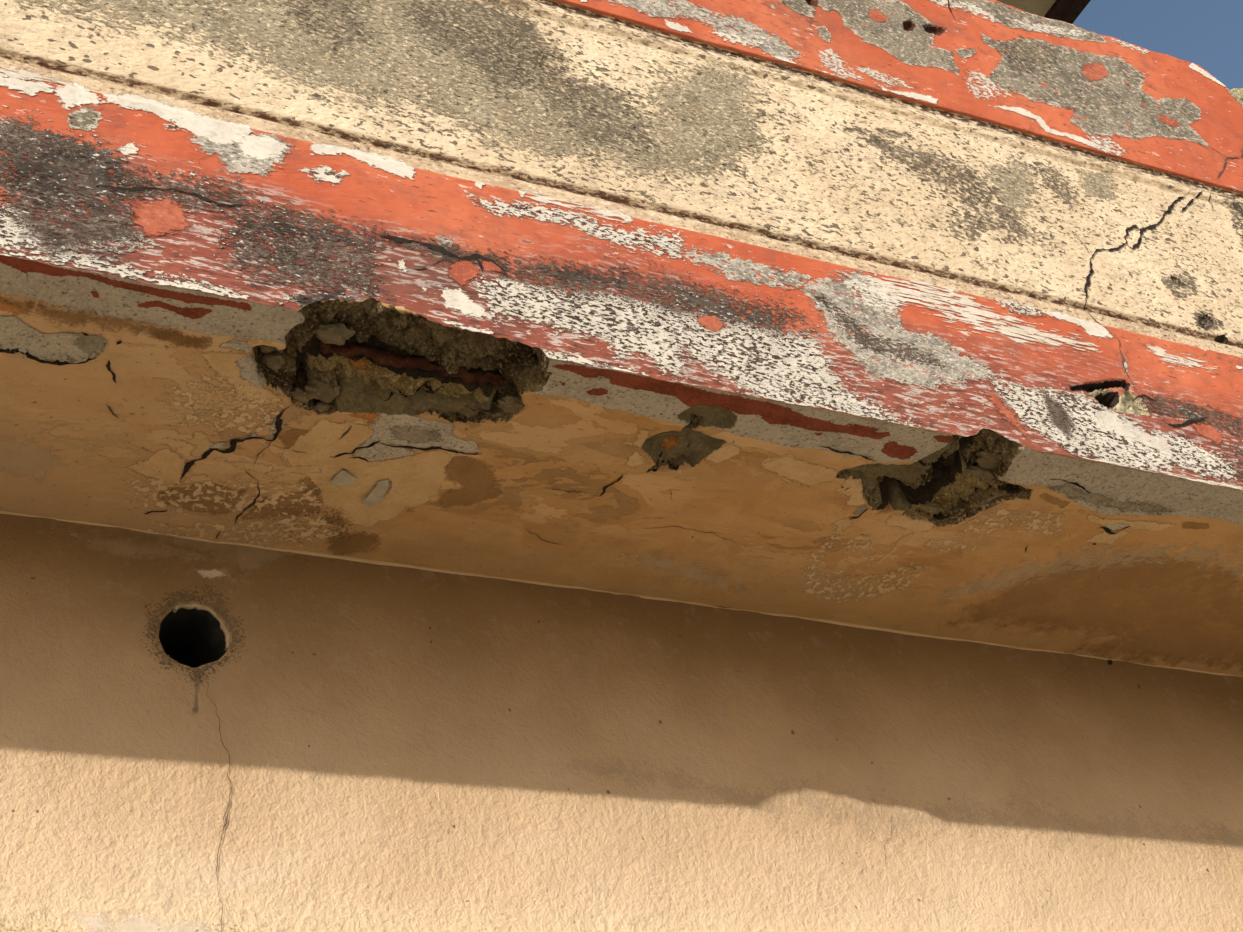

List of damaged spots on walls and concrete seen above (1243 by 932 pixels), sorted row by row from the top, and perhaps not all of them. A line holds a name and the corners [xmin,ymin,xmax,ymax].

peeling [607,0,802,64]
peeling [770,0,1208,156]
crack [1074,147,1243,311]
crack [180,407,478,540]
water stain [945,545,1243,670]
crack [206,681,232,930]